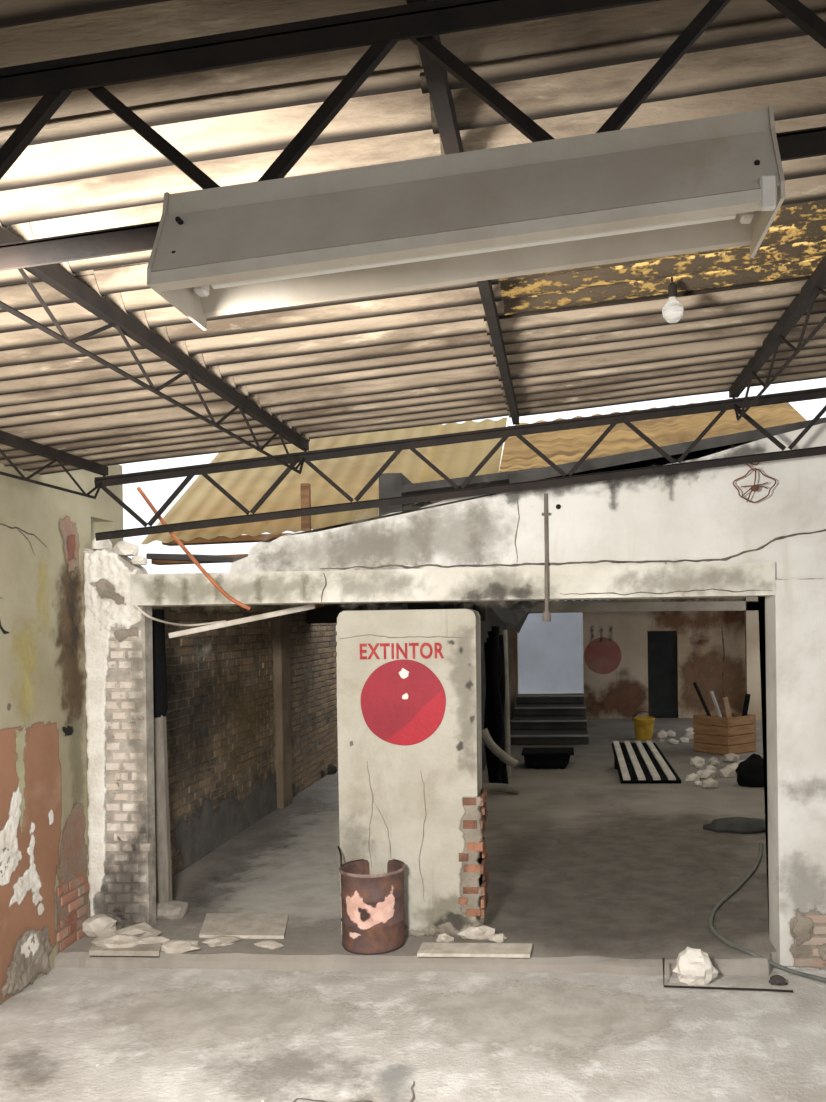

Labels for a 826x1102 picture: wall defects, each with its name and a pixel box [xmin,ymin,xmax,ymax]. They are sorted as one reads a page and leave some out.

crack [0,523,48,555]
crack [320,492,826,602]
flaking render [60,516,150,929]
flaking render [0,787,89,1001]
crack [419,775,427,901]
flaking render [405,788,490,937]
spalling [790,909,826,969]